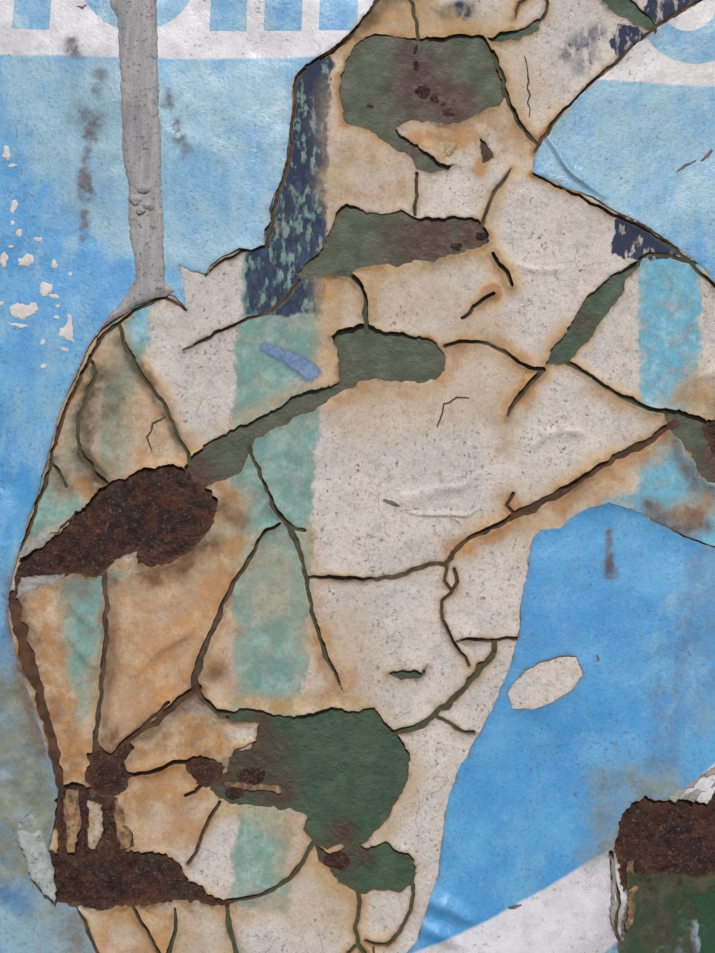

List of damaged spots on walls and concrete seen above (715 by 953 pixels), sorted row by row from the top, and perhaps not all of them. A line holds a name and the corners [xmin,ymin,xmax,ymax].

peeling [339,19,542,173]
crack [480,0,715,288]
peeling [297,205,489,280]
crack [20,297,194,550]
peeling [185,324,446,485]
crack [91,252,680,754]
corrosion [323,373,456,411]
corrosion [447,330,545,421]
crack [9,590,65,790]
corrosion [7,390,366,953]
peeling [210,707,416,895]
corrosion [602,767,715,930]